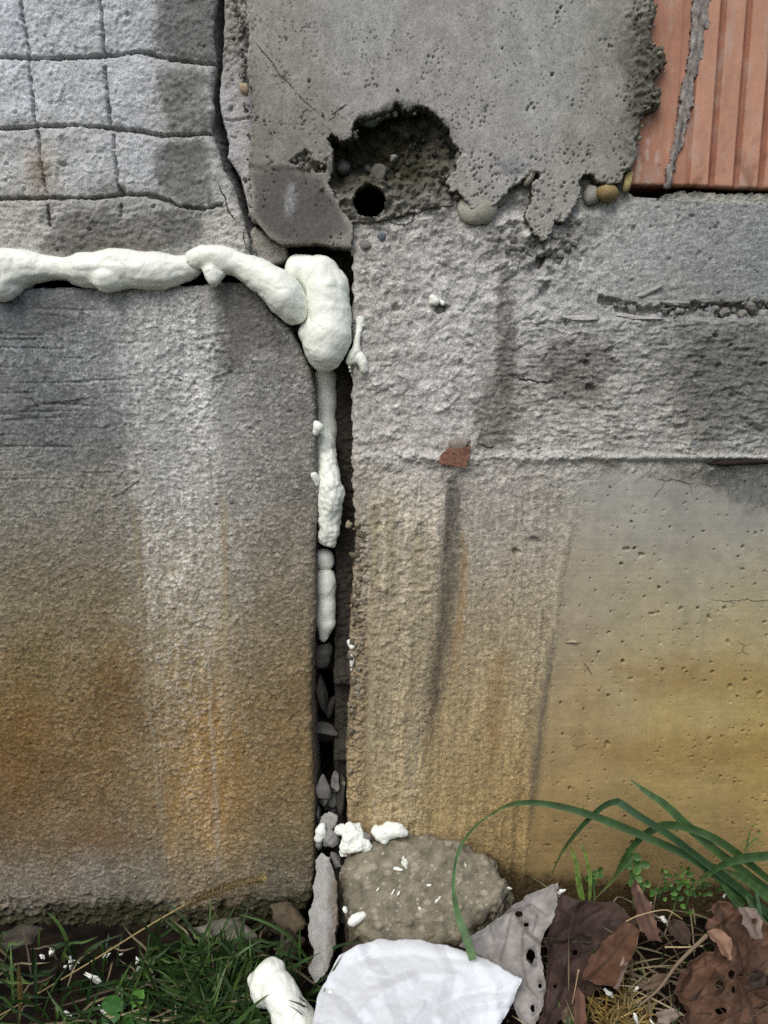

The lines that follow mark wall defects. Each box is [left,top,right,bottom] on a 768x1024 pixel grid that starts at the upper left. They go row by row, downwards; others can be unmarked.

spalling [292,106,462,226]